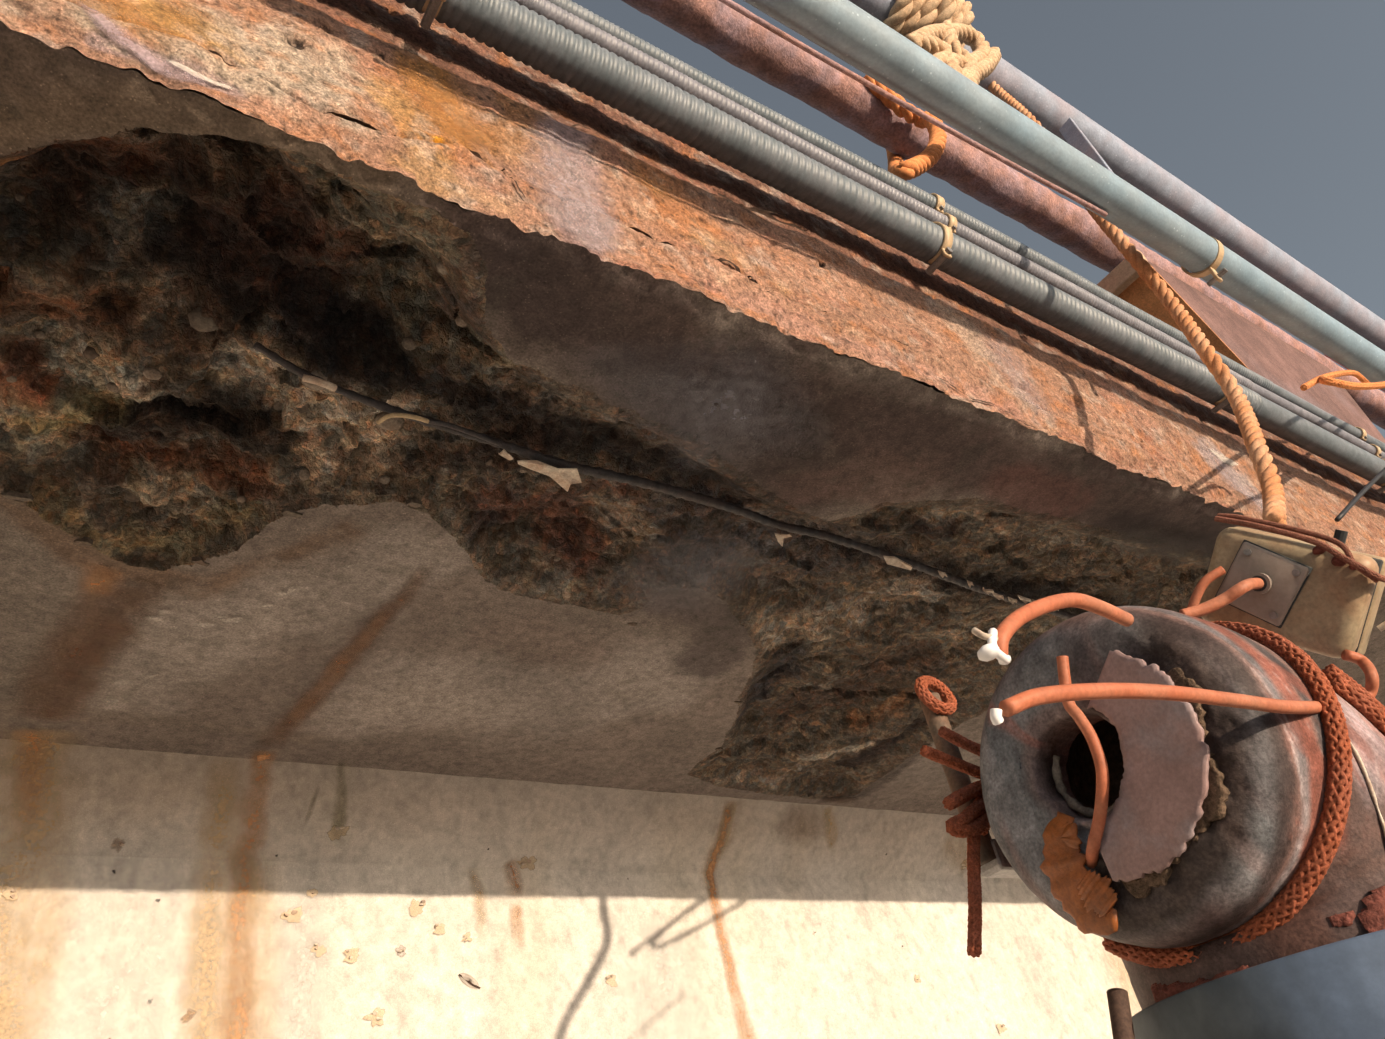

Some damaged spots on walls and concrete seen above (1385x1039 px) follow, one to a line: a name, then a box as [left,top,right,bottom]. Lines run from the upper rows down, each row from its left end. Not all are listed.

spalling [0,126,1212,799]
corrosion [706,809,750,1038]